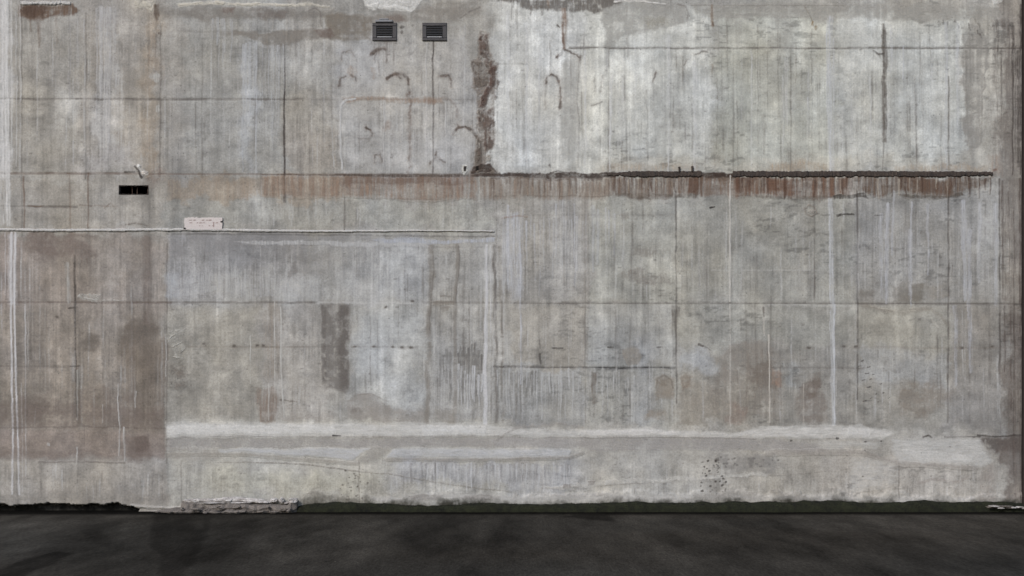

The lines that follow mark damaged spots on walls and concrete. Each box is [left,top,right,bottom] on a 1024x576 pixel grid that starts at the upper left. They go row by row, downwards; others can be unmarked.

rust [17,2,80,49]
spalling [461,29,501,175]
water stain [0,0,643,509]
water stain [155,0,1022,501]
rust [259,151,1005,235]